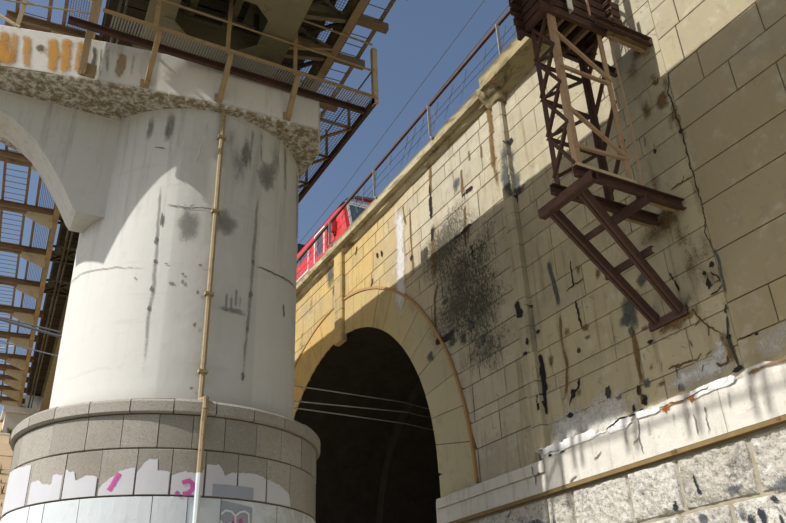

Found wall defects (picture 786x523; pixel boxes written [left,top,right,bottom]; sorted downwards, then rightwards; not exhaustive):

crack [71,266,133,282]
leakage [422,197,533,373]
crack [667,72,758,390]
peeling [534,340,735,459]